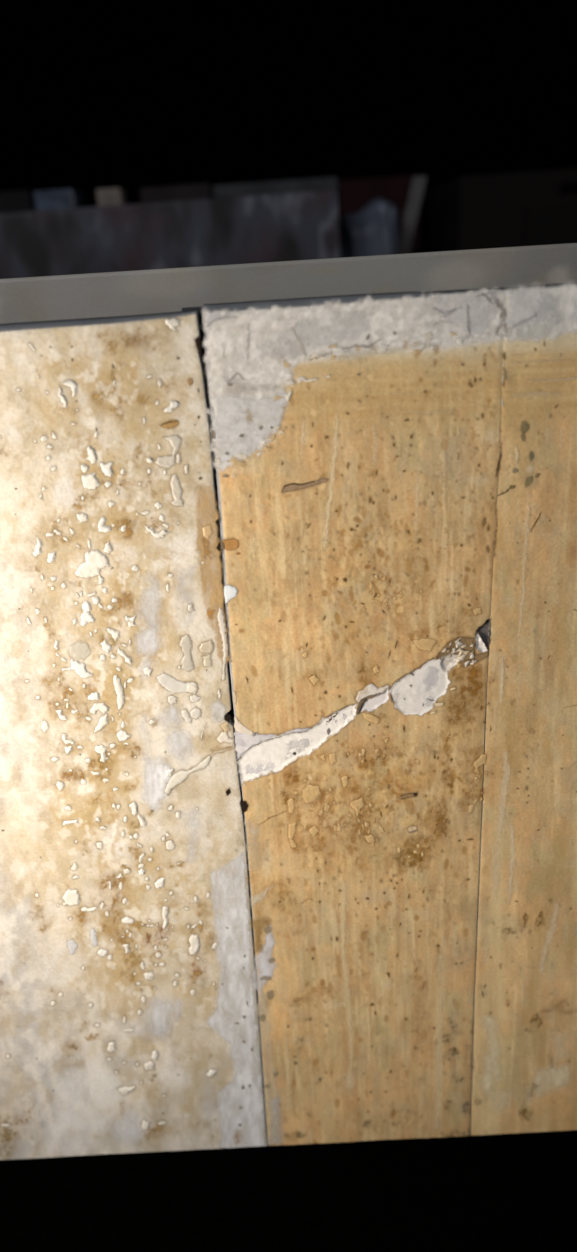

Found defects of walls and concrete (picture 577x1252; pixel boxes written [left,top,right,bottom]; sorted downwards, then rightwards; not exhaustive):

peeling [165,318,180,331]
peeling [188,284,577,478]
spalling [282,478,327,492]
leakage [138,587,158,652]
peeling [468,598,491,648]
peeling [30,375,253,1032]
spalling [389,636,461,731]
leakage [143,707,187,808]
peeling [287,776,388,848]
leakage [208,856,265,1148]
peeling [235,920,275,1024]
peeling [107,1042,158,1095]